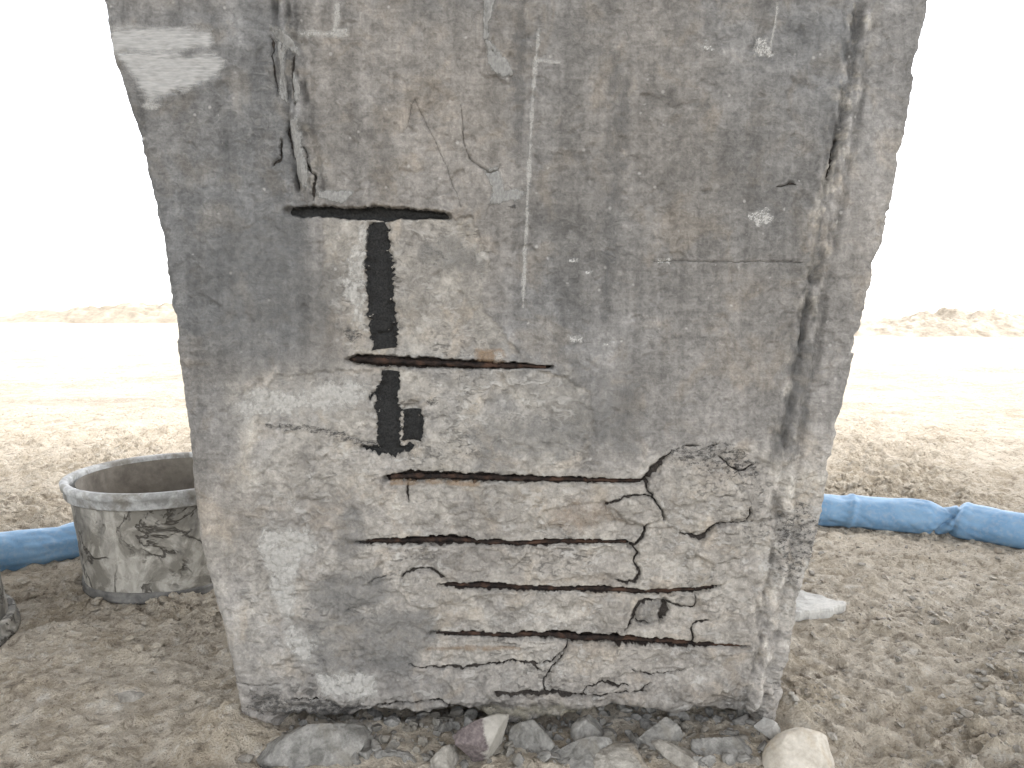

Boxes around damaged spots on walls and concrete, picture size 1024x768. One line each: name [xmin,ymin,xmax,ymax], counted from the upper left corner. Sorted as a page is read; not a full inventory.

crack [271,38,295,93]
crack [274,126,317,197]
spalling [290,117,449,222]
crack [605,444,753,584]
crack [371,567,444,582]
crack [665,597,708,641]
crack [411,640,568,685]
crack [583,669,682,691]